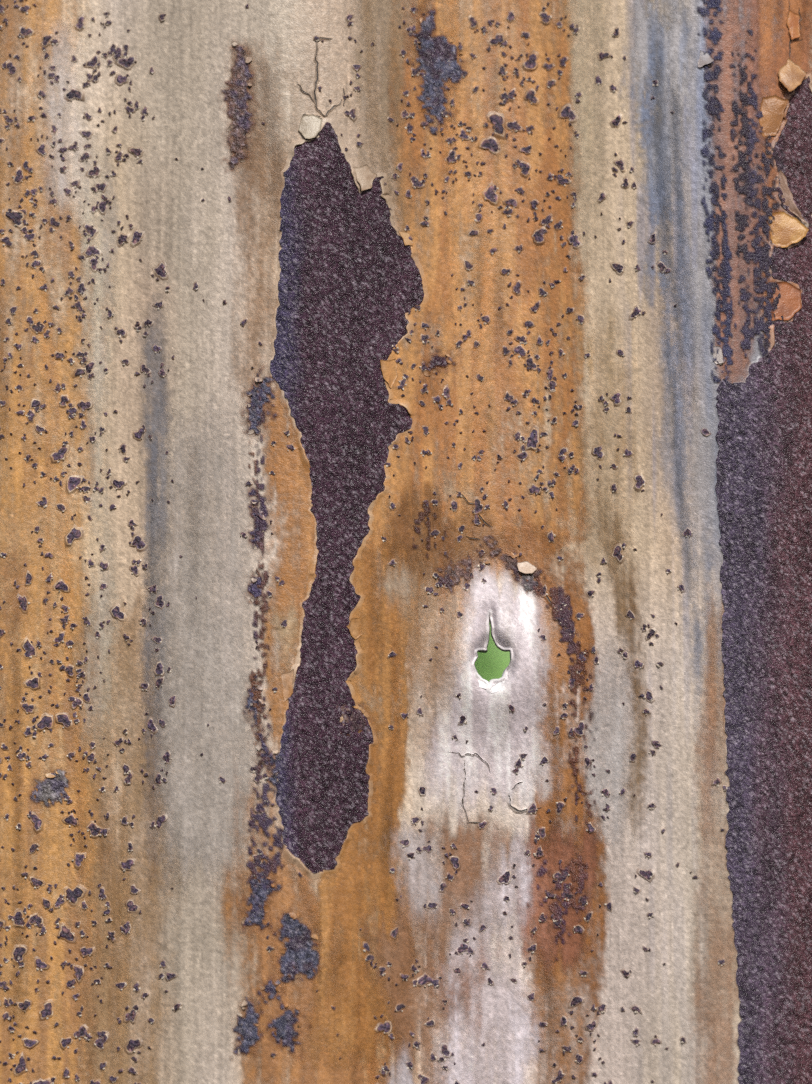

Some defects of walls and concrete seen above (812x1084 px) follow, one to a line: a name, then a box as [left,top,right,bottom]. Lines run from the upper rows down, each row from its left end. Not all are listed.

peeling [222,42,255,170]
crack [297,36,346,118]
peeling [409,9,465,134]
spalling [444,91,524,165]
spalling [518,145,532,179]
spalling [521,50,539,72]
spalling [522,88,540,107]
rust [697,0,812,383]
rust [0,0,183,1084]
peeling [244,114,429,880]
rust [218,0,672,1084]
peeling [713,58,812,1084]